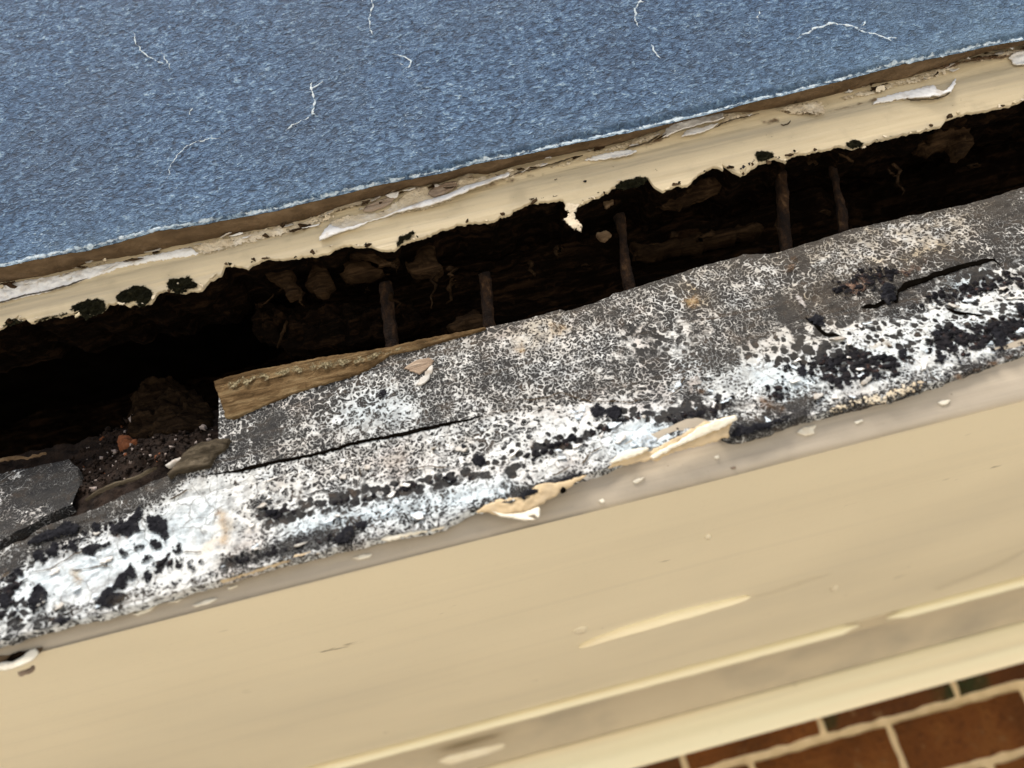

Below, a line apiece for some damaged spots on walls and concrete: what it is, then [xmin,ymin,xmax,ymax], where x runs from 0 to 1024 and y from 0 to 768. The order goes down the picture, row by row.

water stain [753,37,1023,100]
peeling [843,47,1024,105]
water stain [246,104,737,215]
water stain [0,217,212,267]
peeling [0,111,753,303]
spalling [295,142,1024,344]
crack [170,376,686,500]
mould [590,404,623,420]
peeling [556,389,737,468]
peeling [476,475,586,521]
mould [27,505,204,608]
mould [26,583,48,612]